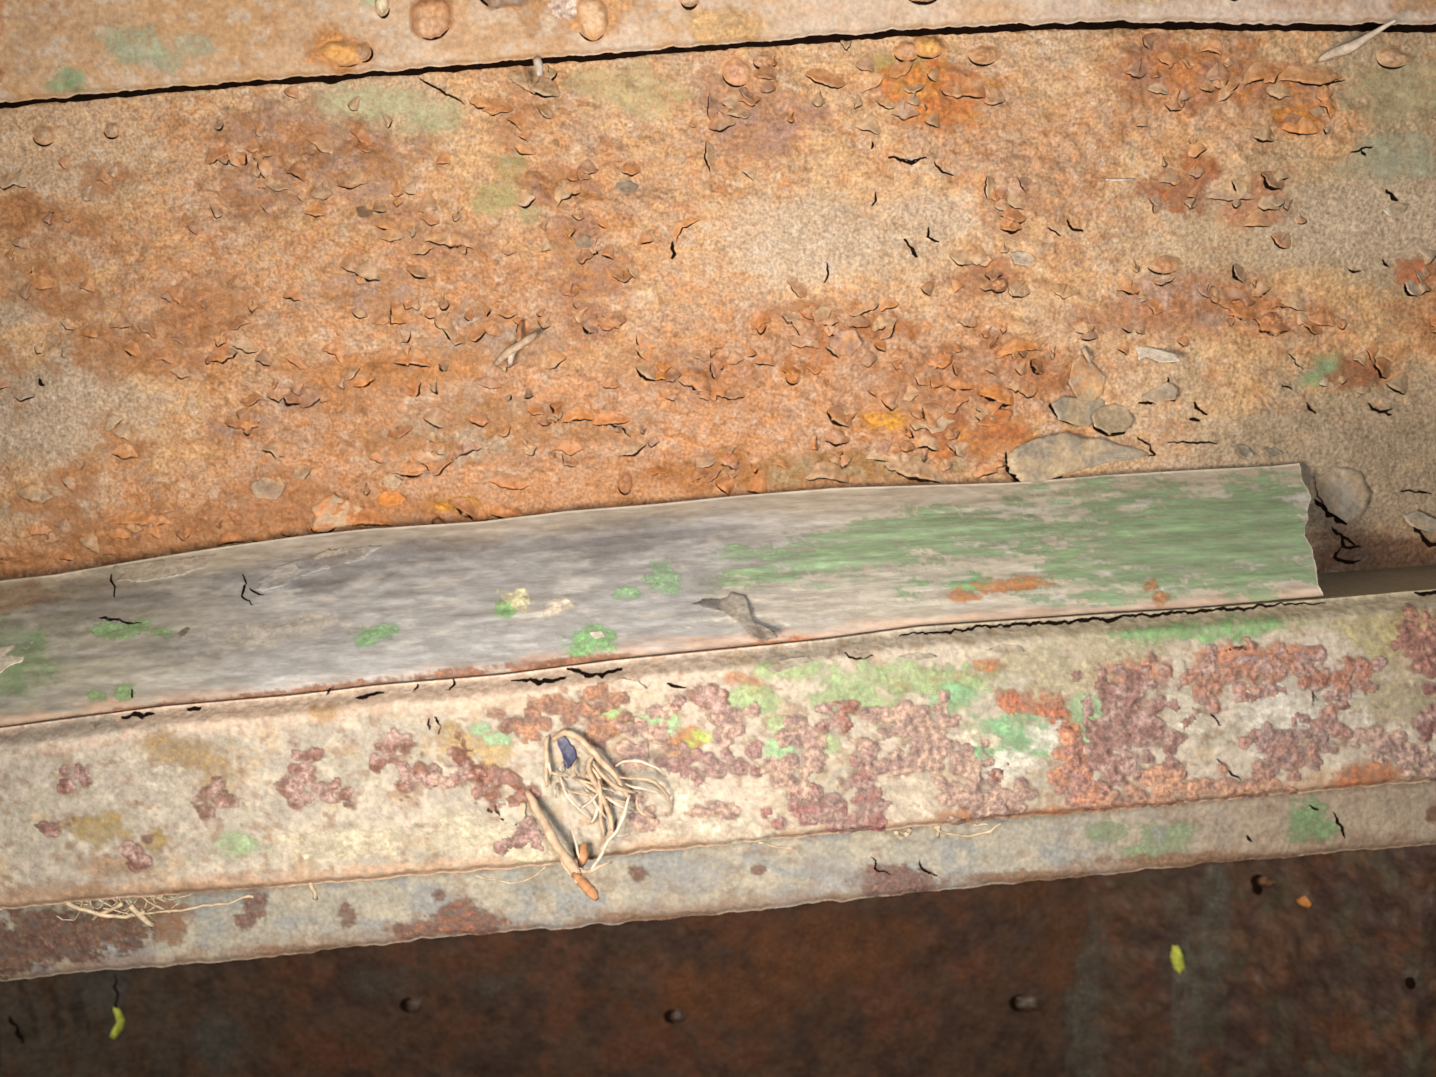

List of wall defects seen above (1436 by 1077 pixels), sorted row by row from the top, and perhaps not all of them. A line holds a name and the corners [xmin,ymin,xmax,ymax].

crack [0,20,1436,109]
spalling [689,40,1005,181]
rust [892,34,949,62]
spalling [1114,32,1341,143]
spalling [1137,134,1307,249]
spalling [204,85,660,506]
spalling [517,159,1348,496]
rust [0,459,548,607]
rust [273,747,353,810]
rust [369,728,546,857]
rust [487,604,1436,834]
rust [0,897,187,978]